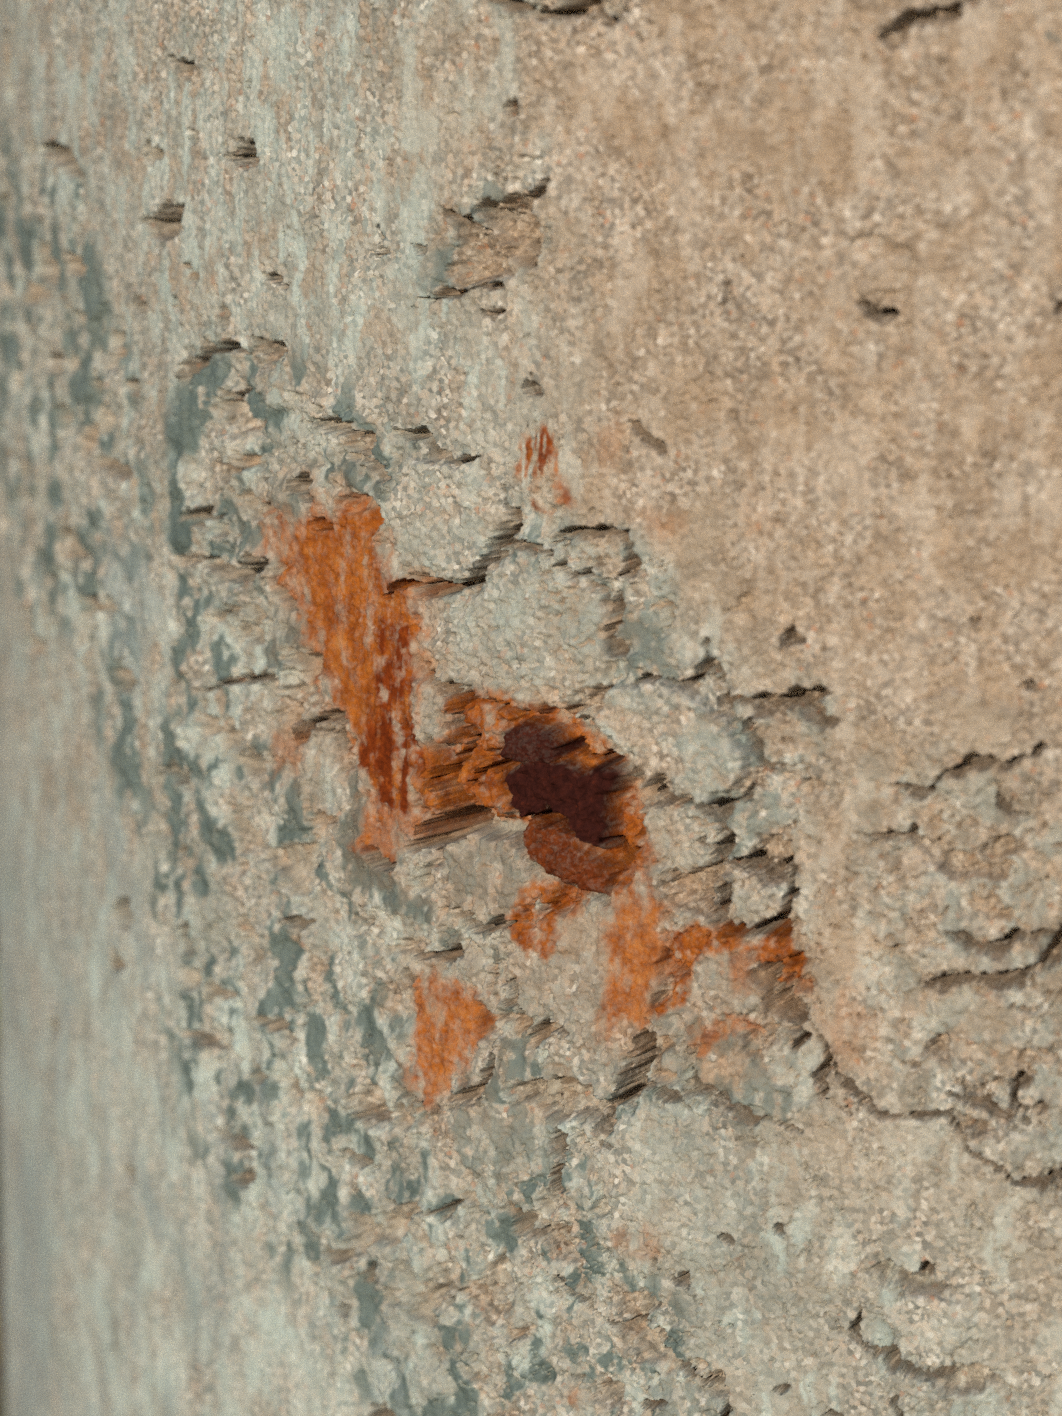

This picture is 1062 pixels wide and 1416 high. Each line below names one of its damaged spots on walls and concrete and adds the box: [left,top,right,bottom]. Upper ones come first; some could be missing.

spalling [0,97,862,1416]
rust [388,947,508,1137]
rust [229,446,888,1082]
crack [309,412,1062,1416]
spalling [809,1234,1062,1416]
spalling [818,685,1062,1256]
spalling [1018,674,1040,691]